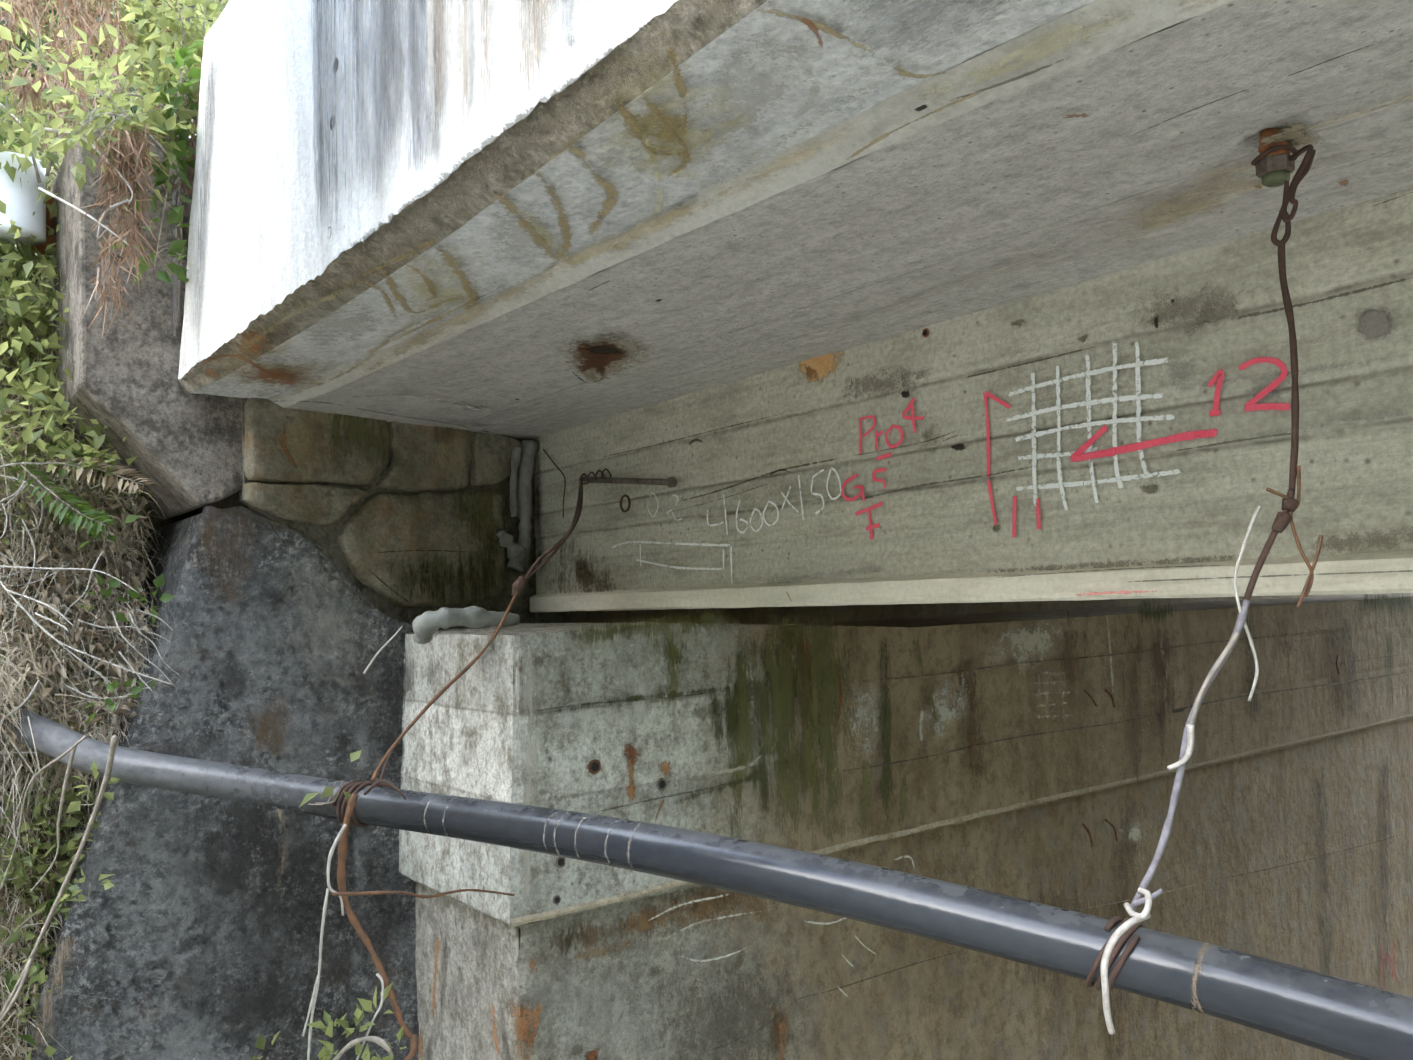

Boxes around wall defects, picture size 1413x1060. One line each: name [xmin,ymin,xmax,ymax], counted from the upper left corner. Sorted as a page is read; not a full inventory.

water stain [514,0,591,88]
water stain [312,0,489,232]
spalling [566,333,647,383]
spalling [800,351,844,382]
water stain [556,611,907,839]
corrosion [624,743,639,800]